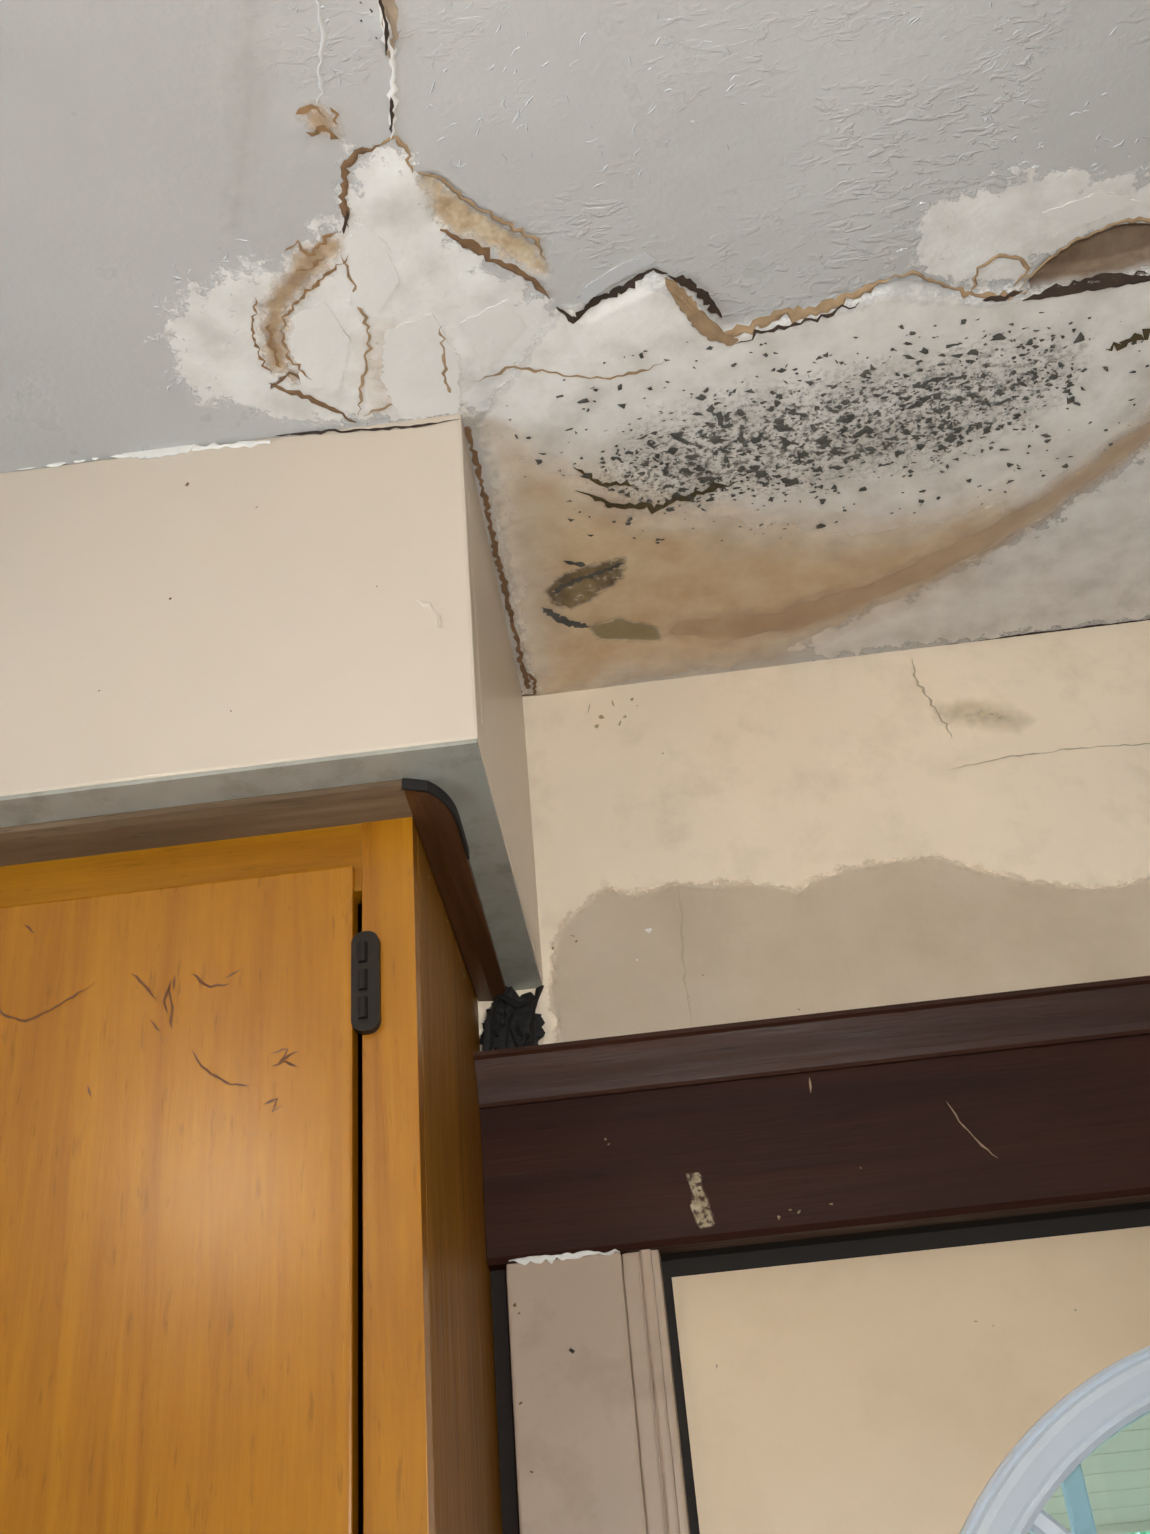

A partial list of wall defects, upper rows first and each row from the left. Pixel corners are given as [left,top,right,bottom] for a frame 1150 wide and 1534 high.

peeling [17,440,270,470]
peeling [145,142,573,428]
crack [270,0,664,696]
crack [556,253,1030,346]
water stain [506,312,1150,728]
peeling [781,441,1150,660]
peeling [911,166,1150,301]